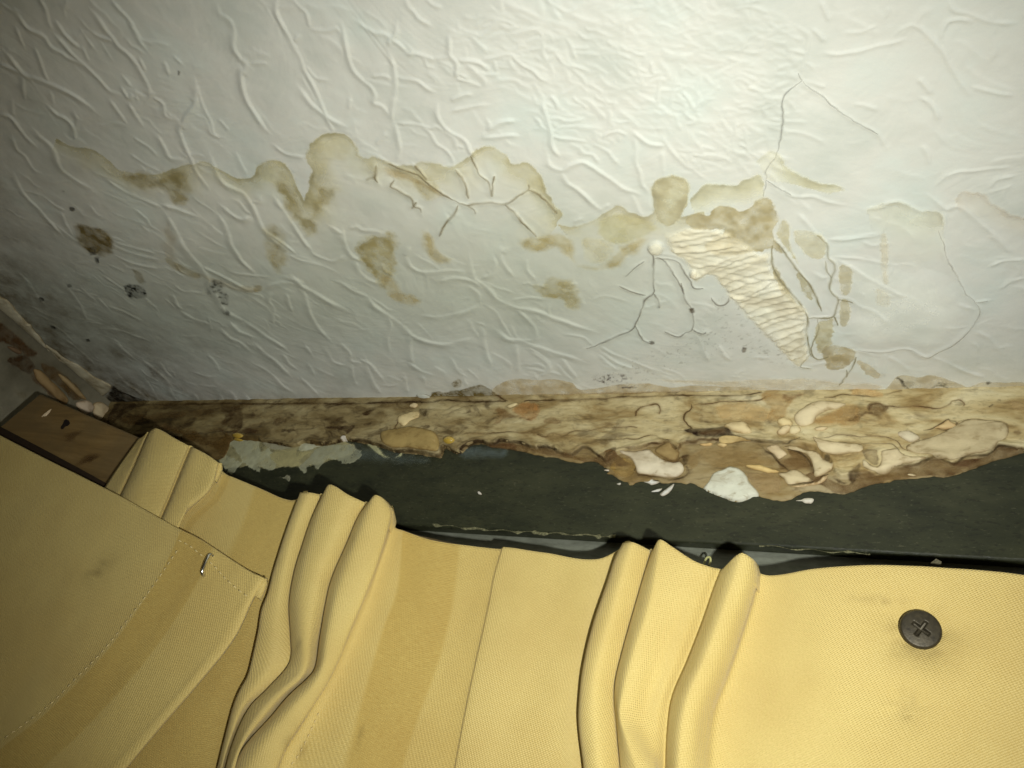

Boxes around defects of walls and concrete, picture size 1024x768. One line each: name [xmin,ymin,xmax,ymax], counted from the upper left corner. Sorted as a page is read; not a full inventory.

damp [78,225,112,263]
damp [274,161,323,228]
crack [374,164,452,230]
damp [602,176,788,256]
peeling [0,296,112,420]
crack [621,252,728,339]
damp [815,266,879,377]
crack [771,246,969,431]
peeling [220,435,361,473]
peeling [380,394,439,451]
peeling [620,442,684,496]
flaking render [703,388,1009,504]